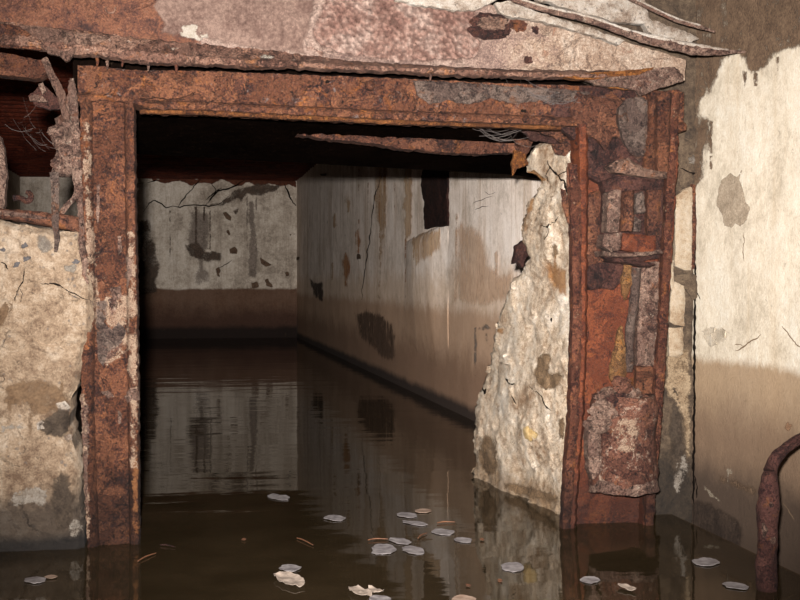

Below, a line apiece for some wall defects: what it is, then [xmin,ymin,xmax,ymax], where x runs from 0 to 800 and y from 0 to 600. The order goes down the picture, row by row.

peeling [28,82,61,111]
rust [295,130,571,182]
crack [139,179,244,212]
crack [361,168,385,298]
rust [375,167,440,265]
spalling [717,170,750,227]
crack [1,262,91,302]
peeling [703,327,726,347]
spalling [531,354,565,396]
leakage [1,380,68,432]